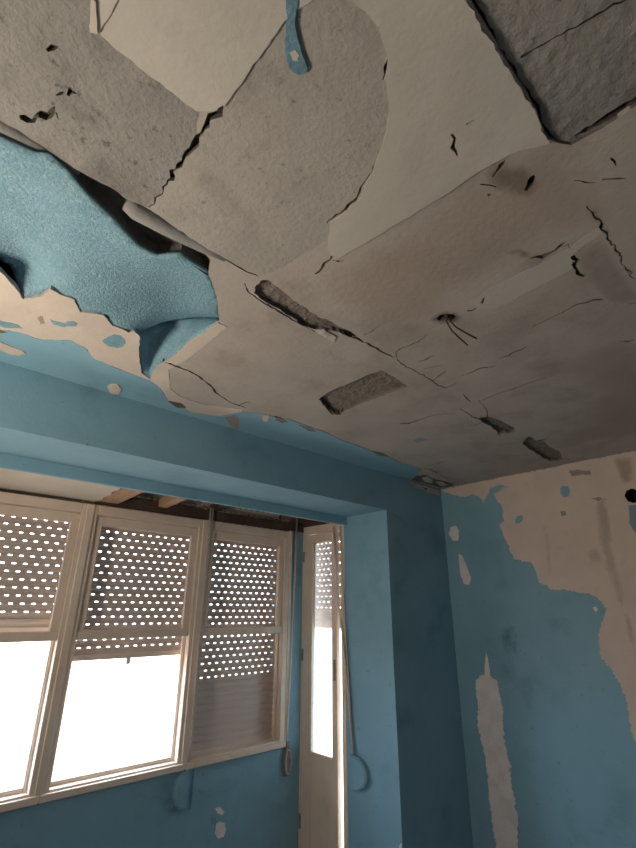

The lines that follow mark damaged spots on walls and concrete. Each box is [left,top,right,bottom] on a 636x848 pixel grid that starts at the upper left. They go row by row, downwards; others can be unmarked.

crack [149,106,224,208]
flaking render [0,0,550,416]
spalling [469,227,636,309]
crack [586,206,633,276]
peeling [0,330,636,742]
peeling [475,653,518,848]
peeling [211,807,226,839]